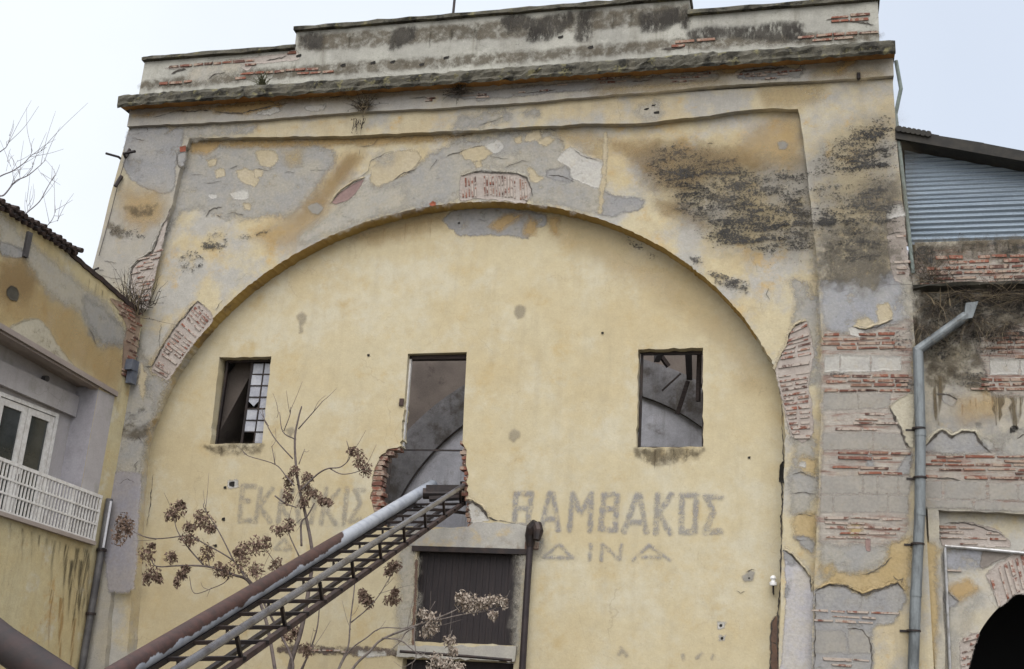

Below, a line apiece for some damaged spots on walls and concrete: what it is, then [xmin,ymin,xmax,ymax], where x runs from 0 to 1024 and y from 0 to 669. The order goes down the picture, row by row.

damp [140,5,875,88]
peeling [298,64,803,242]
damp [624,115,899,286]
damp [710,271,749,294]
peeling [0,99,336,593]
spalling [769,200,1024,669]
spalling [370,447,404,512]
spalling [460,440,489,526]
damp [64,546,89,616]